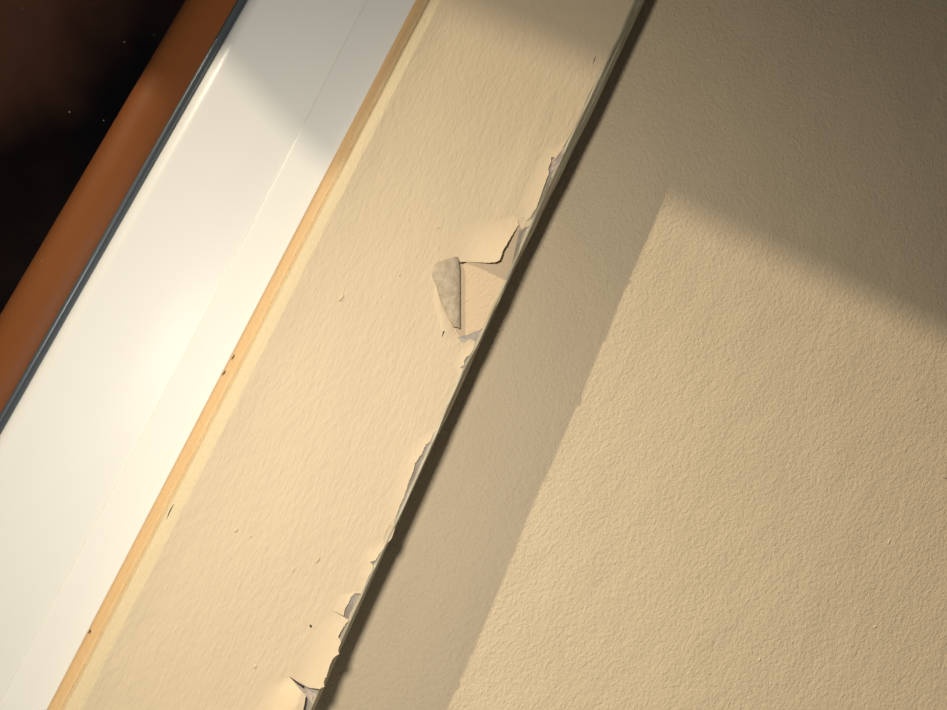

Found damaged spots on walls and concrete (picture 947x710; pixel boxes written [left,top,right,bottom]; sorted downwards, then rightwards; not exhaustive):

peeling [432,139,568,376]
peeling [240,429,436,710]